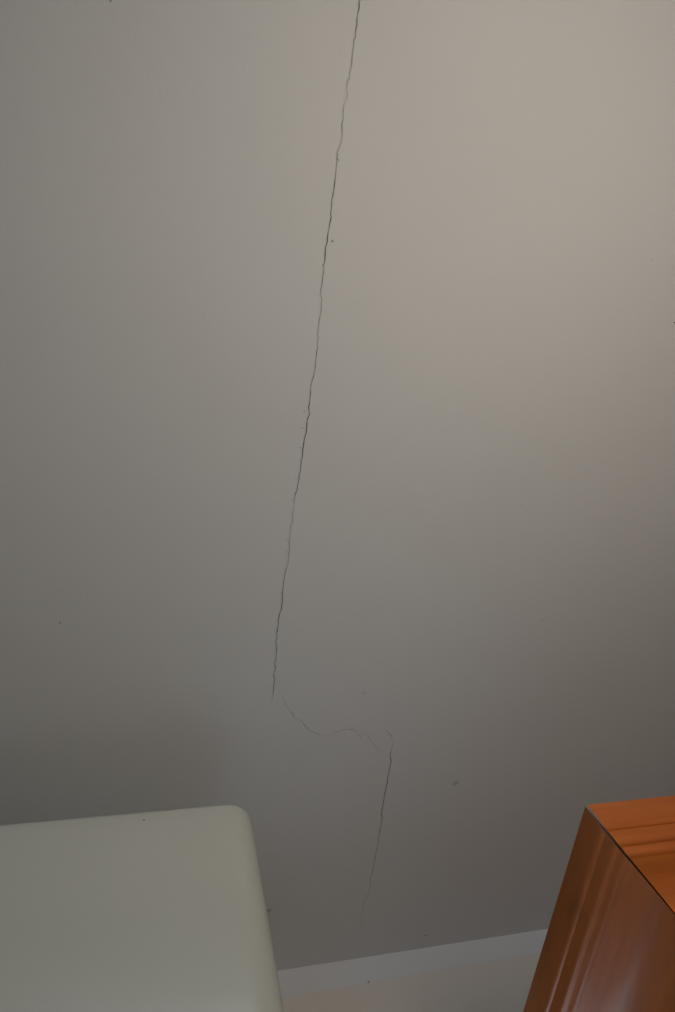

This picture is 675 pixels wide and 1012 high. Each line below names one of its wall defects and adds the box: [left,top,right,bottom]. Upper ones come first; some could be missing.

crack [295,364,316,494]